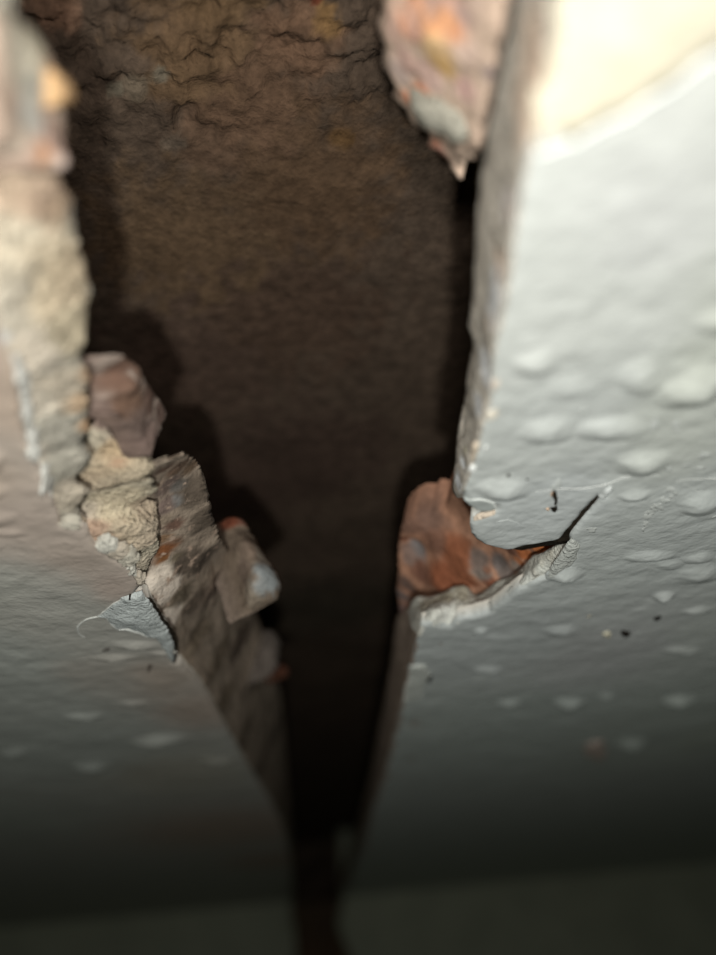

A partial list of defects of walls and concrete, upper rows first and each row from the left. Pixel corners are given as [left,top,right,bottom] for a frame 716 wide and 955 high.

flaking render [0,14,76,175]
peeling [58,514,81,531]
spalling [77,533,178,663]
flaking render [216,517,283,624]
peeling [468,441,488,472]
spalling [396,473,580,637]
crack [543,476,629,542]
crack [641,452,716,532]